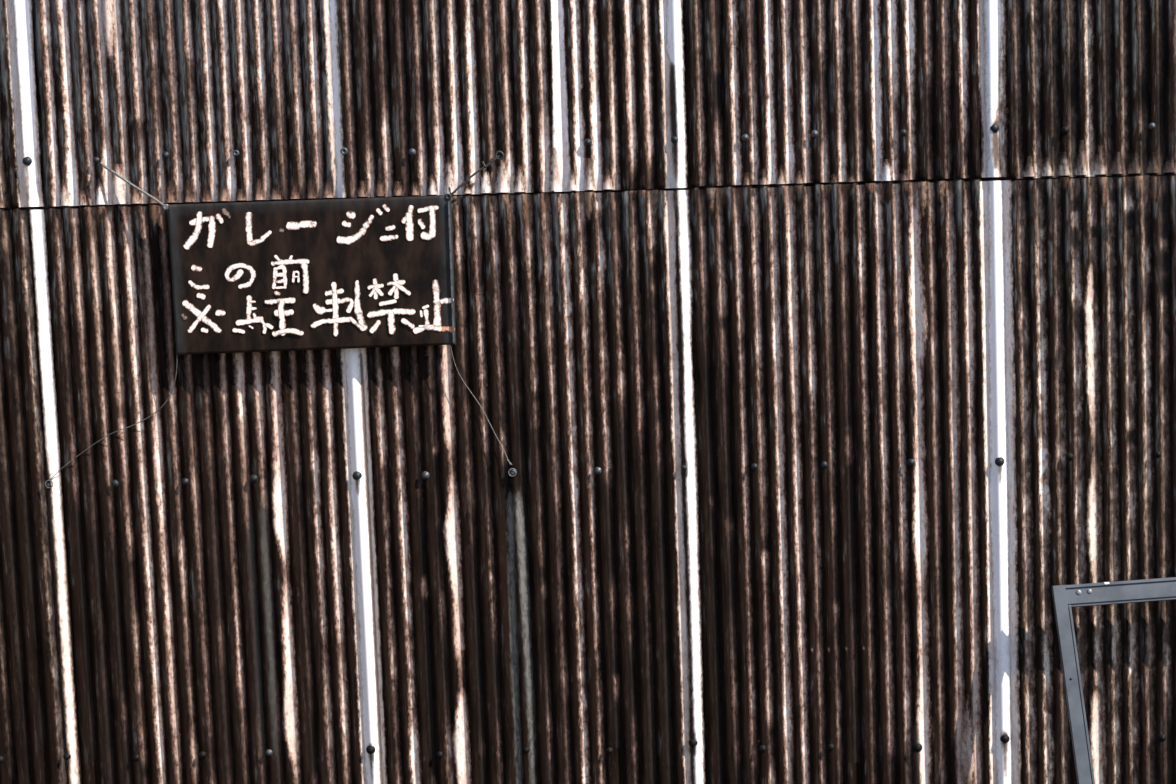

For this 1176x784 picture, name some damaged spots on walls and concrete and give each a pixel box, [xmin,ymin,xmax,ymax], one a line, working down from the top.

corrosion [1025,198,1034,245]
corrosion [1089,177,1108,204]
corrosion [1124,175,1170,238]